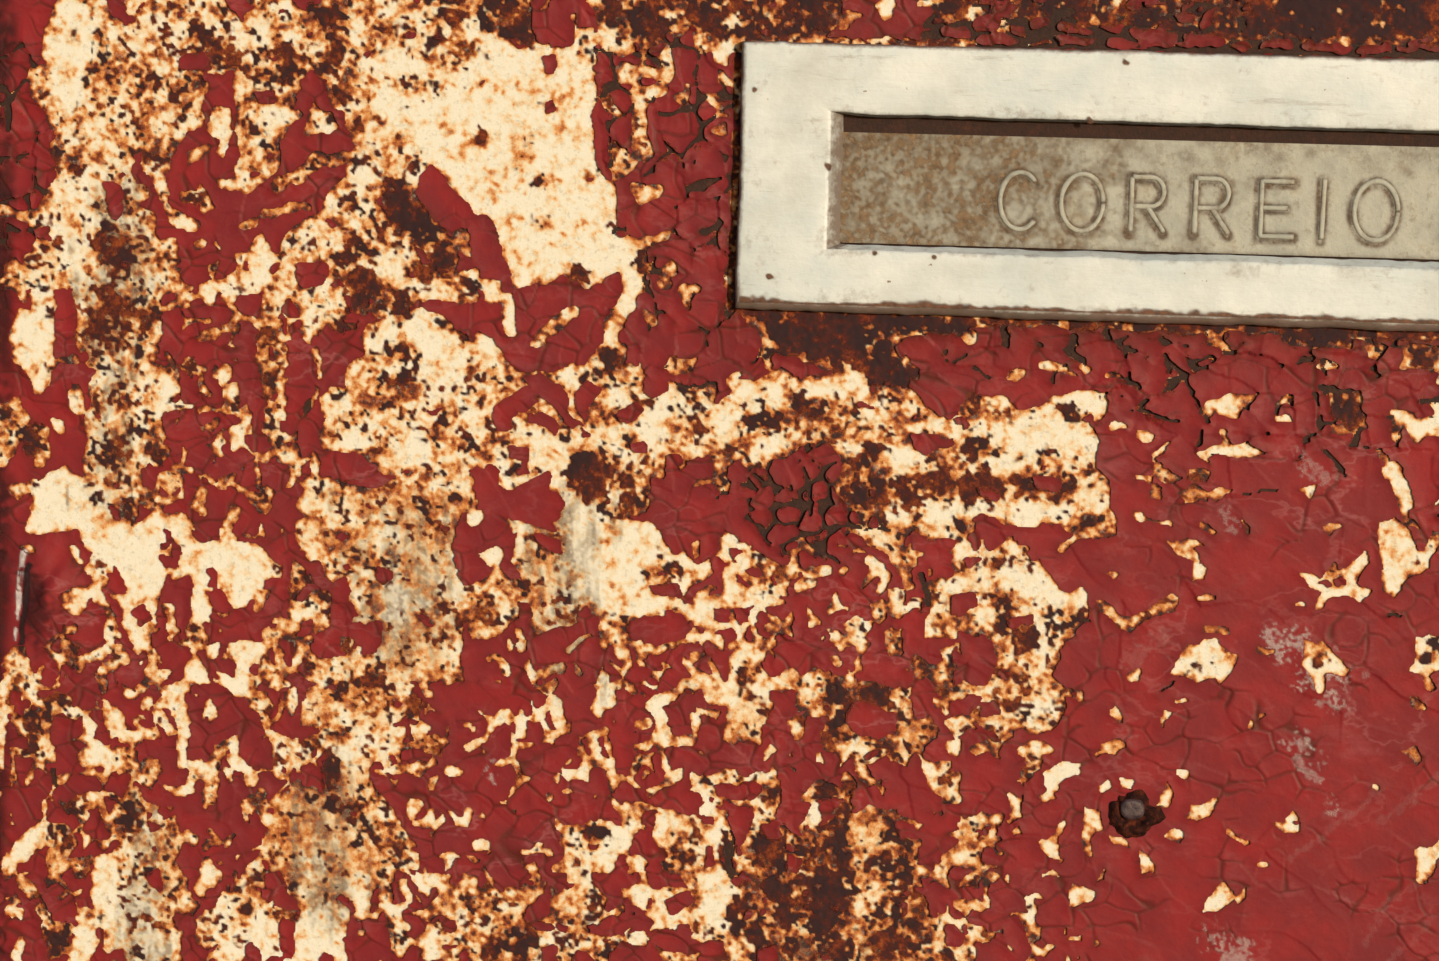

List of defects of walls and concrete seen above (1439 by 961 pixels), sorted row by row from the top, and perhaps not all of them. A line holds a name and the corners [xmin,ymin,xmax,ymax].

rust [0,0,1439,621]
peeling [0,0,1117,961]
crack [716,432,917,563]
crack [916,324,1439,477]
peeling [1135,429,1266,504]
crack [918,572,931,607]
rust [889,547,1089,744]
peeling [1171,625,1238,683]
rust [200,532,581,950]
crack [724,830,736,879]
rust [662,770,975,961]
peeling [1011,806,1155,961]